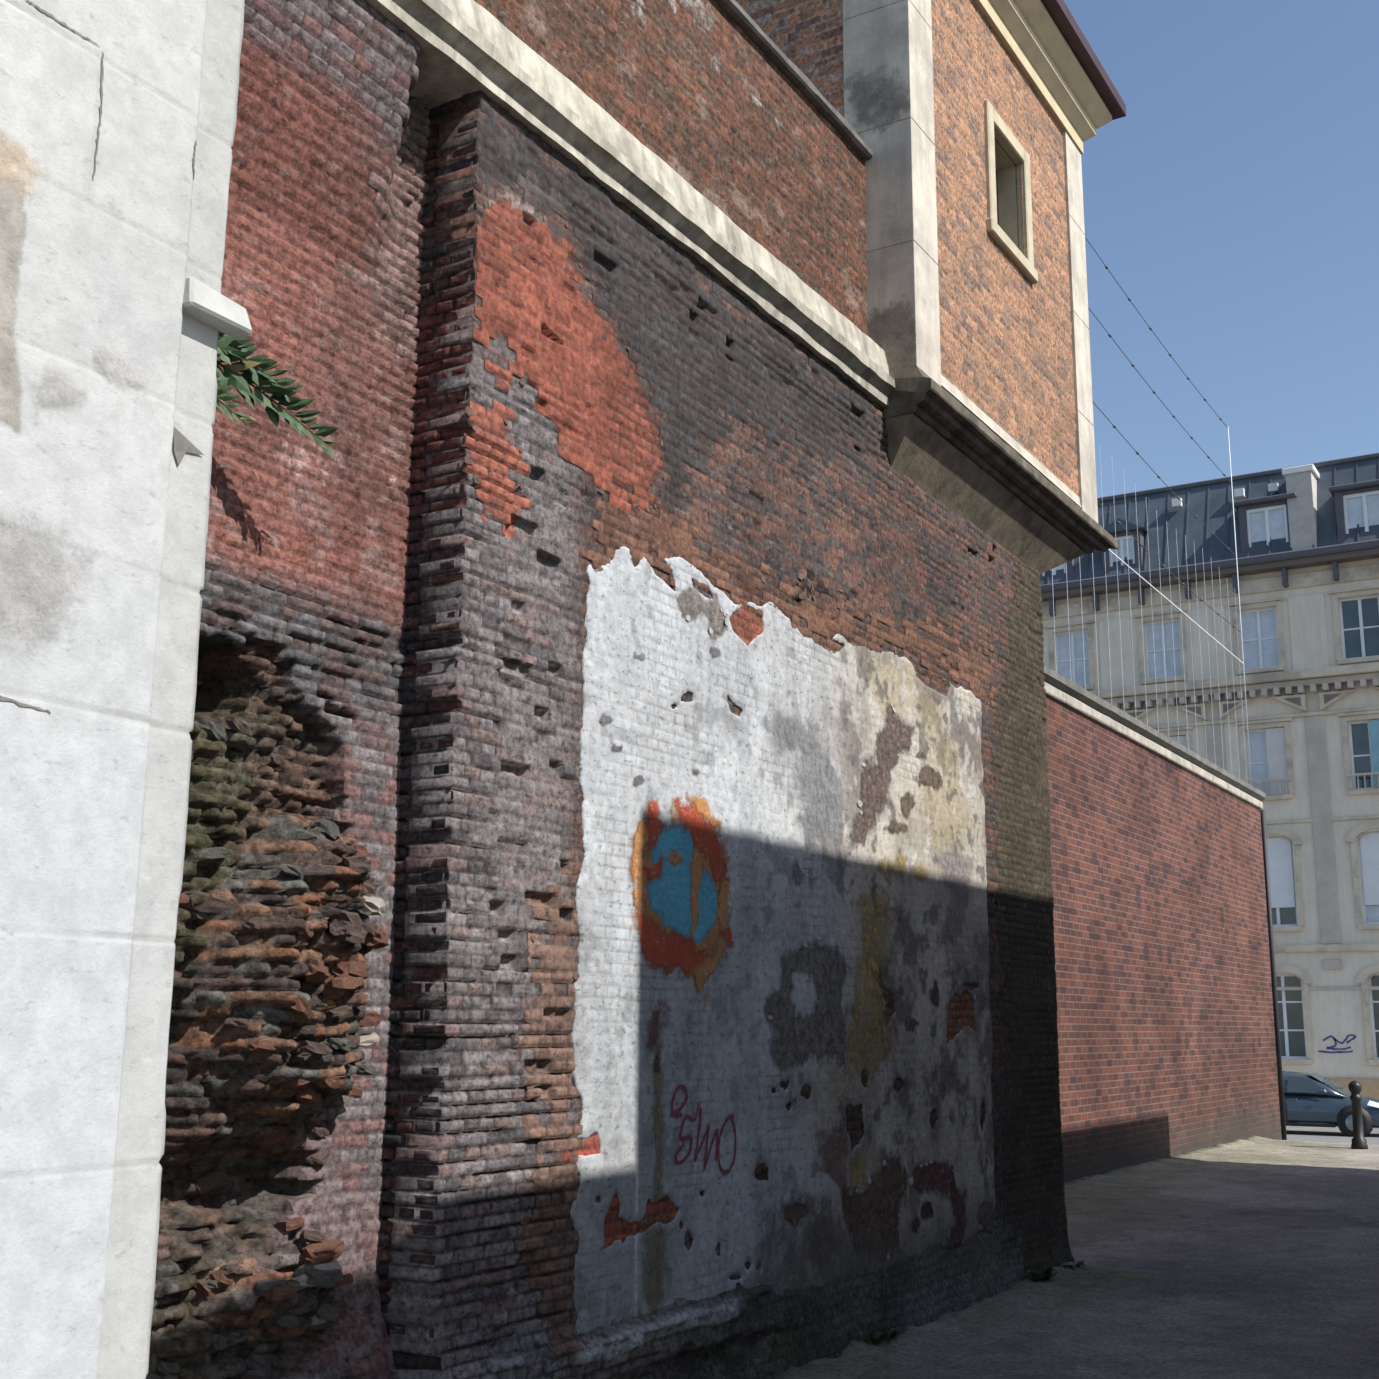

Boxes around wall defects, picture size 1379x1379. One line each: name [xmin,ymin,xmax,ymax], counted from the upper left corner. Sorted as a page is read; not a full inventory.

crack [27,0,104,180]
damp [843,67,910,130]
spalling [460,181,998,708]
peeling [938,842,974,952]
spalling [146,626,357,1379]
spalling [932,962,976,1043]
spalling [604,1193,679,1249]